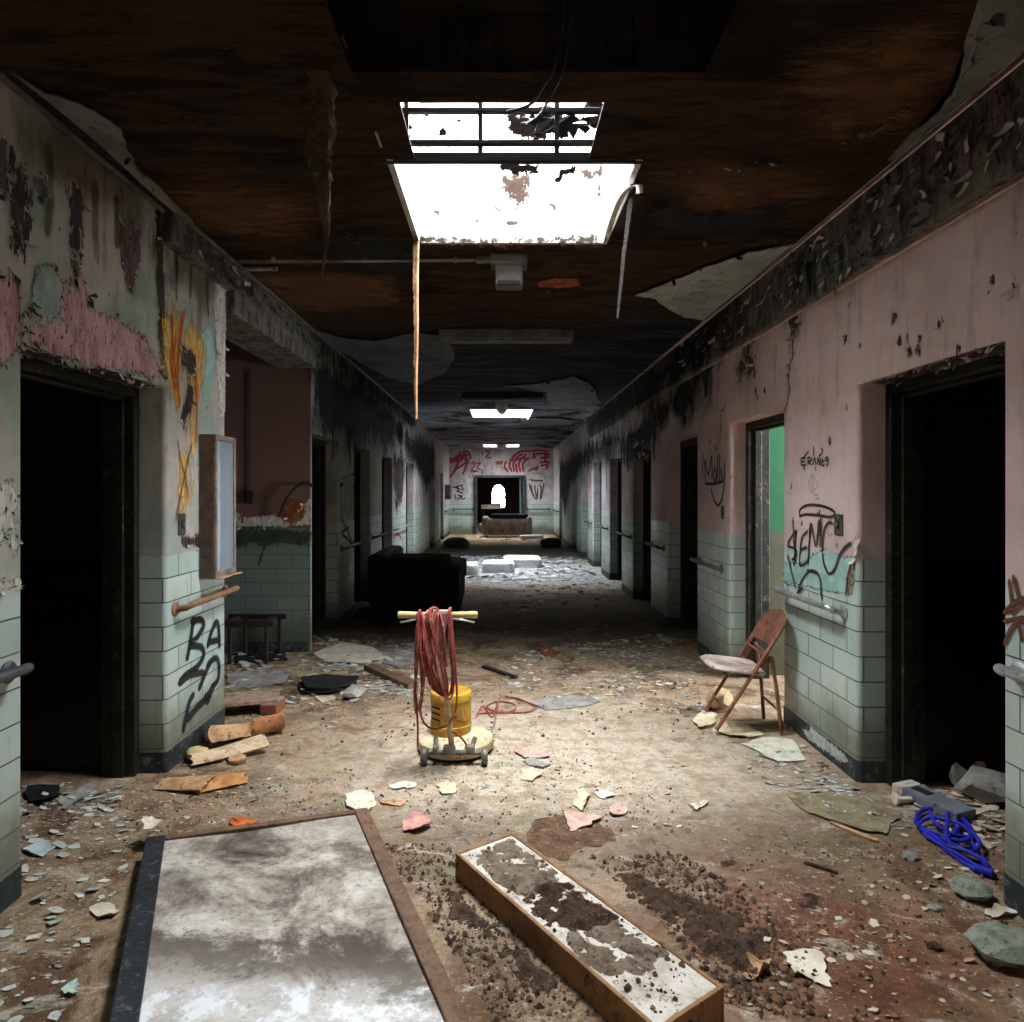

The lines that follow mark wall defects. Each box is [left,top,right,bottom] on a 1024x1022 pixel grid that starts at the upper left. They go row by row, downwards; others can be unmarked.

peeling [782,0,1024,341]
peeling [0,70,255,431]
flaking render [635,244,792,321]
flaking render [317,331,454,385]
peeling [0,478,24,557]
peeling [783,537,860,594]